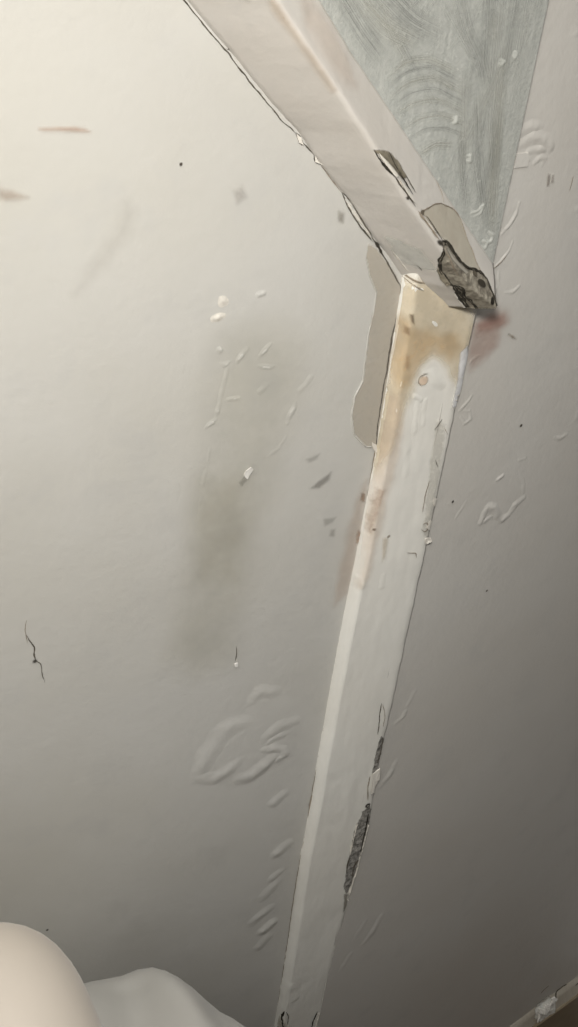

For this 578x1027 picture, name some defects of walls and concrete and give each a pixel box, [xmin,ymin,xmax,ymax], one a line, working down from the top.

spalling [374,150,498,309]
crack [25,624,45,682]
spalling [344,703,385,910]
spalling [534,996,558,1022]